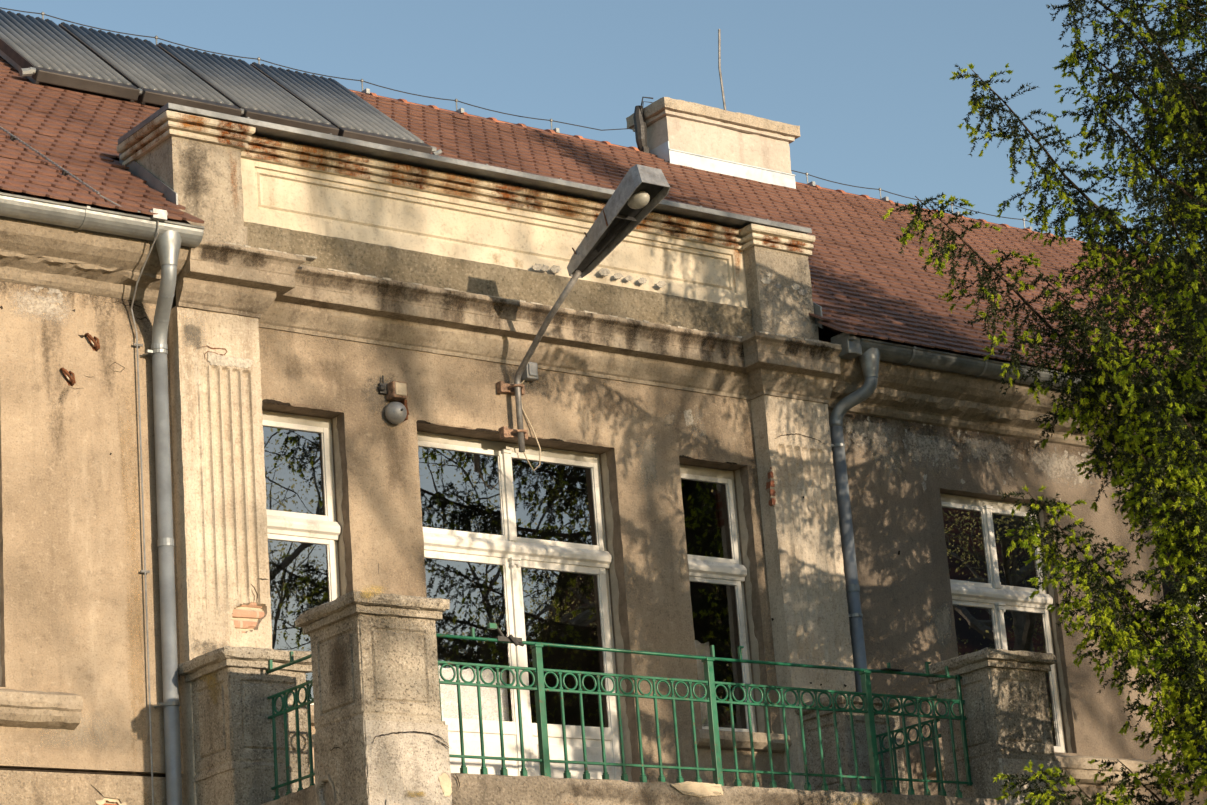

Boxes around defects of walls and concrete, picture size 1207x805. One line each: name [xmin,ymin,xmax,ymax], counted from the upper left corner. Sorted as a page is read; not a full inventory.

rust [183,114,606,220]
rust [636,213,740,270]
leakage [302,273,745,363]
spalling [765,467,776,507]
spalling [232,602,265,633]
peeling [679,455,765,733]